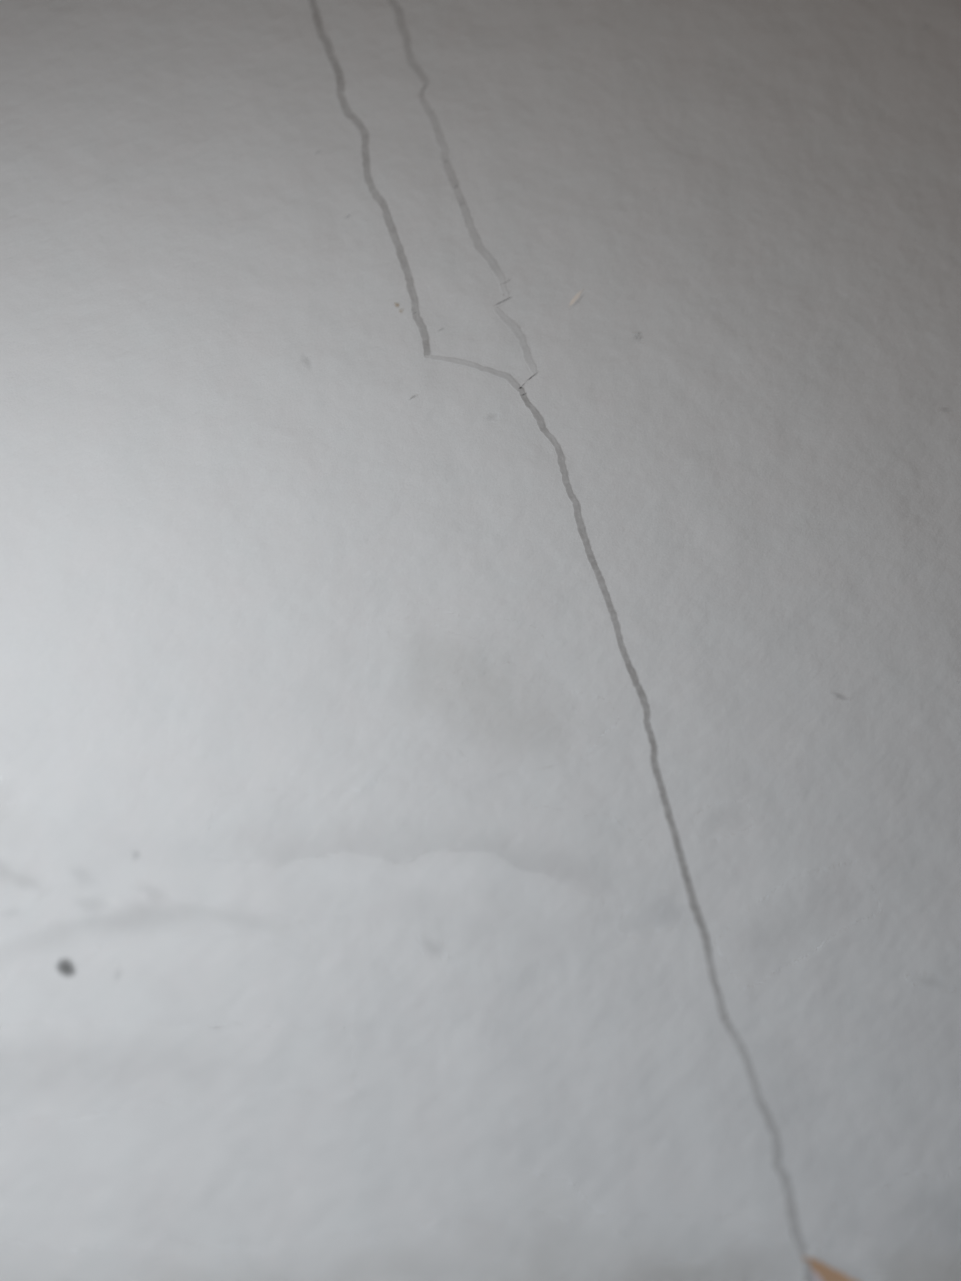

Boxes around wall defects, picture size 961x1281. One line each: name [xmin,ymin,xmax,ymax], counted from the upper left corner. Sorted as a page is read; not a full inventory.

crack [308,0,813,1281]
peeling [803,1251,887,1281]